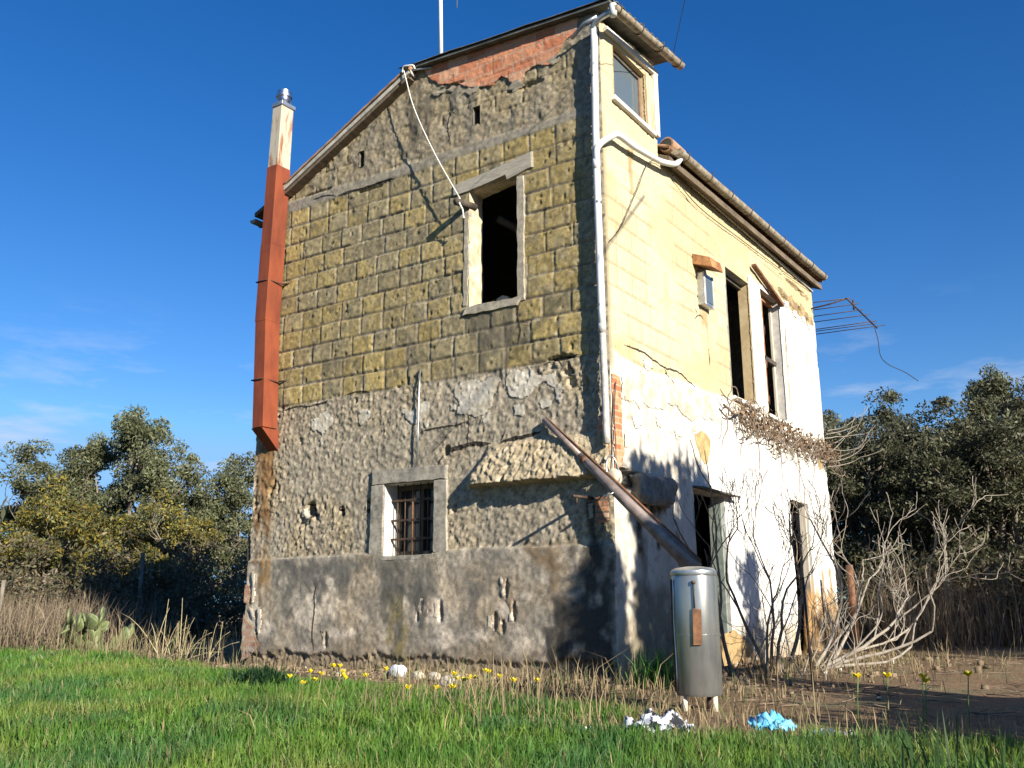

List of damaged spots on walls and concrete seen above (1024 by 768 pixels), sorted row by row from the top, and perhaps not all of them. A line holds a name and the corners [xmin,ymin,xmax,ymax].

spalling [425,18,579,97]
flaking render [450,366,565,424]
spalling [585,373,628,467]
crack [625,345,710,387]
spalling [692,424,711,464]
spalling [241,571,262,661]
spalling [415,597,443,620]
spalling [487,577,517,634]